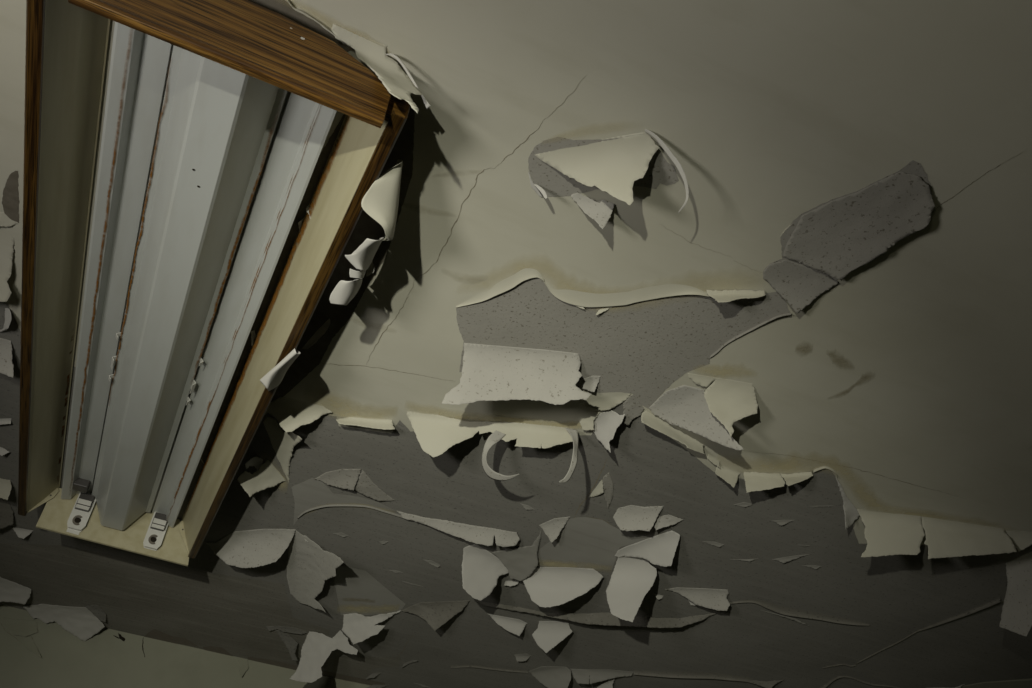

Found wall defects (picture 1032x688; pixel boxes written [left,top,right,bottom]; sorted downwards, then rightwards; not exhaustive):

peeling [248,0,430,482]
crack [301,75,587,381]
flaking render [0,160,1032,688]
peeling [528,129,689,229]